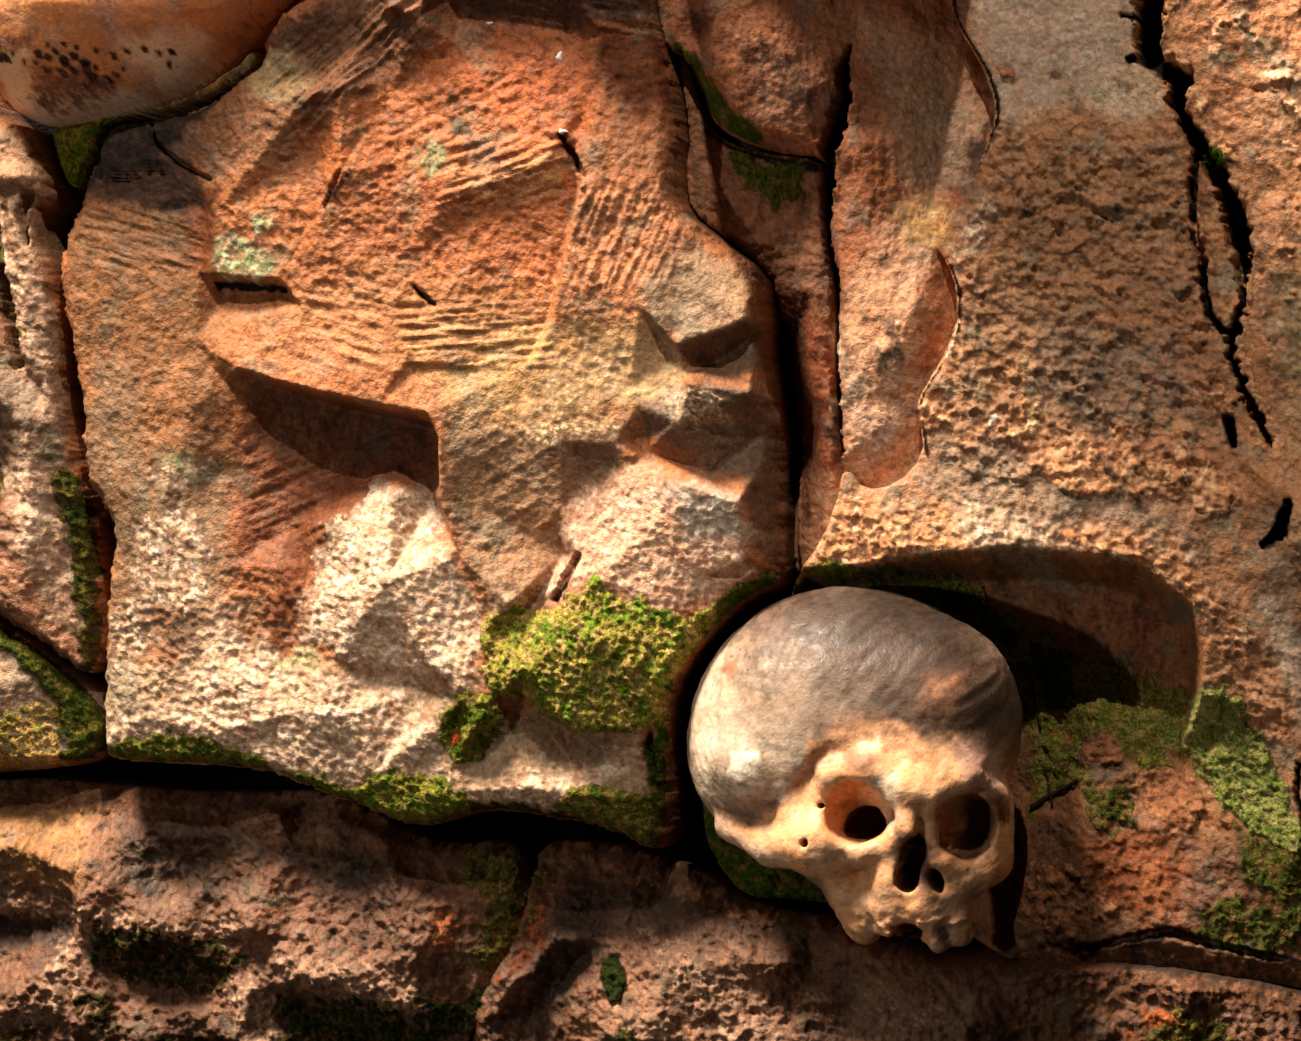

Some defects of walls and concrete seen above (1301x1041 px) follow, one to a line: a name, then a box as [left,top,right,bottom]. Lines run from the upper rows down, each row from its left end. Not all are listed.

crack [1121,0,1261,448]
crack [1259,498,1293,549]